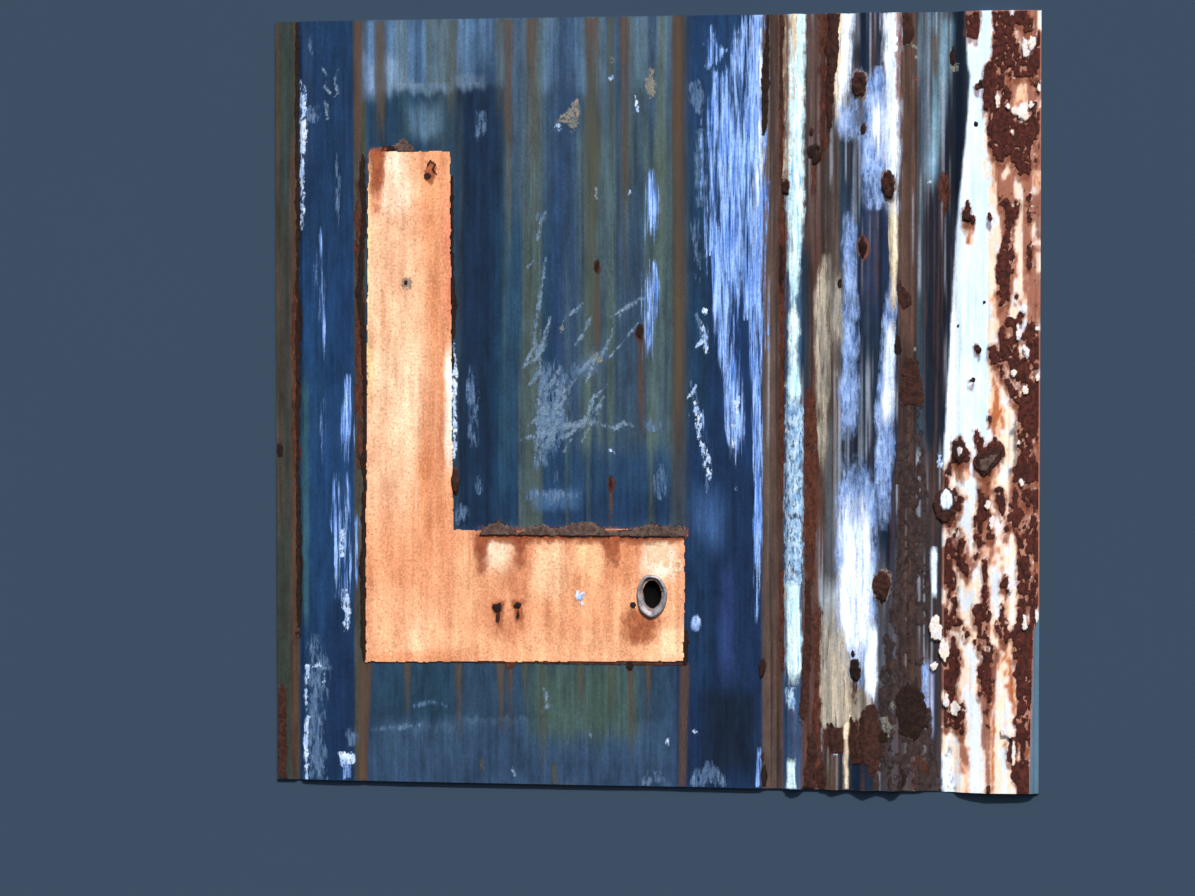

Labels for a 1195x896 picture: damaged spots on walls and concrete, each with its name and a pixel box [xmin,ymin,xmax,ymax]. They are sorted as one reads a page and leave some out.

corrosion [355,21,414,193]
corrosion [451,467,460,495]
corrosion [475,519,687,571]
peeling [687,385,712,480]
peeling [695,15,769,618]
corrosion [758,570,785,679]
corrosion [761,15,790,516]
peeling [783,14,860,710]
peeling [820,12,901,788]
corrosion [798,10,1040,793]
spalling [933,440,1020,529]
peeling [786,761,796,789]